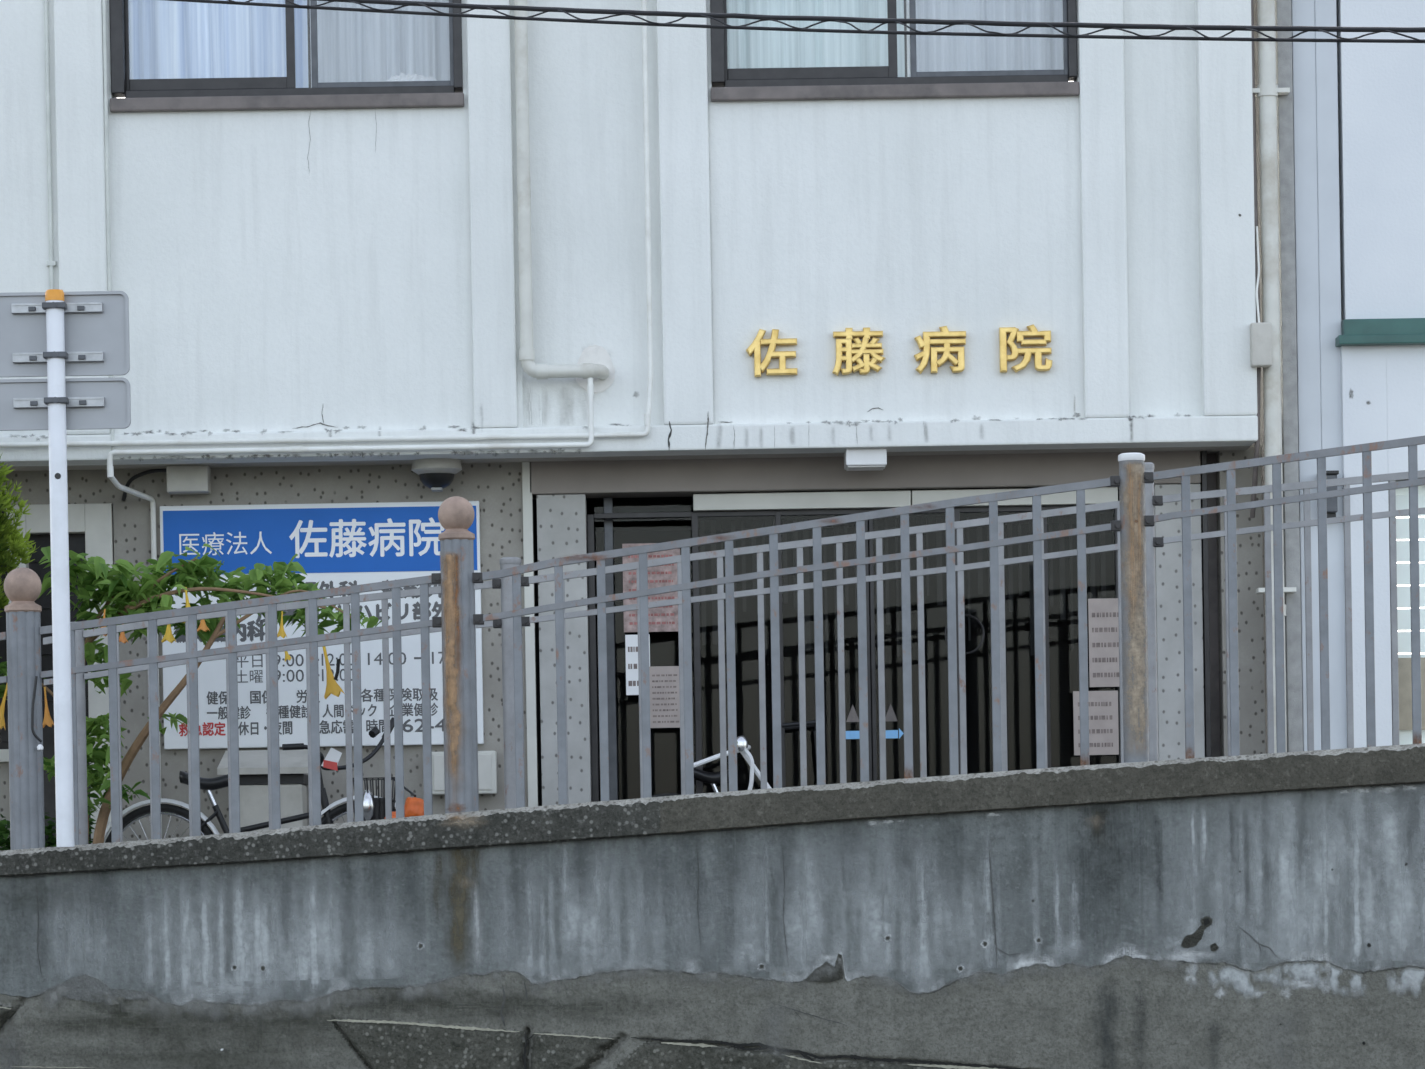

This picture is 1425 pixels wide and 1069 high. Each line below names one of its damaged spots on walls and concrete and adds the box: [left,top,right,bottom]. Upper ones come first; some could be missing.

spalling [30,974,169,1005]
water stain [148,889,342,1003]
water stain [437,849,479,959]
water stain [527,862,606,980]
water stain [740,864,850,981]
water stain [858,860,999,981]
spalling [456,916,1425,997]
water stain [1014,866,1077,969]
water stain [1105,947,1147,964]
water stain [1172,951,1194,962]
water stain [1188,814,1207,935]
water stain [1216,786,1425,969]